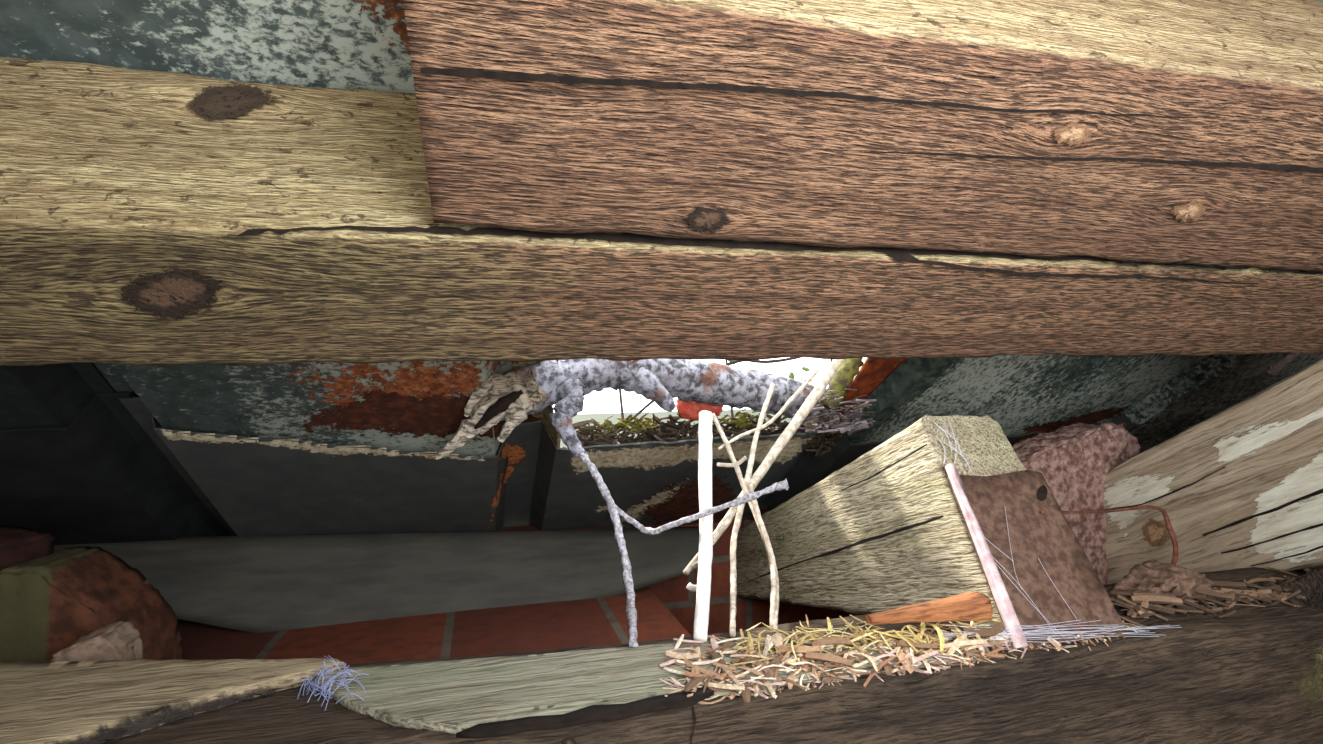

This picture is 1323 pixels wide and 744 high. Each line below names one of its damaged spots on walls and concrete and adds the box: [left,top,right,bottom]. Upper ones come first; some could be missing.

corrosion [355,0,412,66]
crack [420,67,1198,118]
crack [227,226,1323,284]
corrosion [272,361,519,438]
peeling [1213,407,1323,464]
corrosion [475,414,546,528]
peeling [1104,470,1175,537]
peeling [1248,447,1323,565]